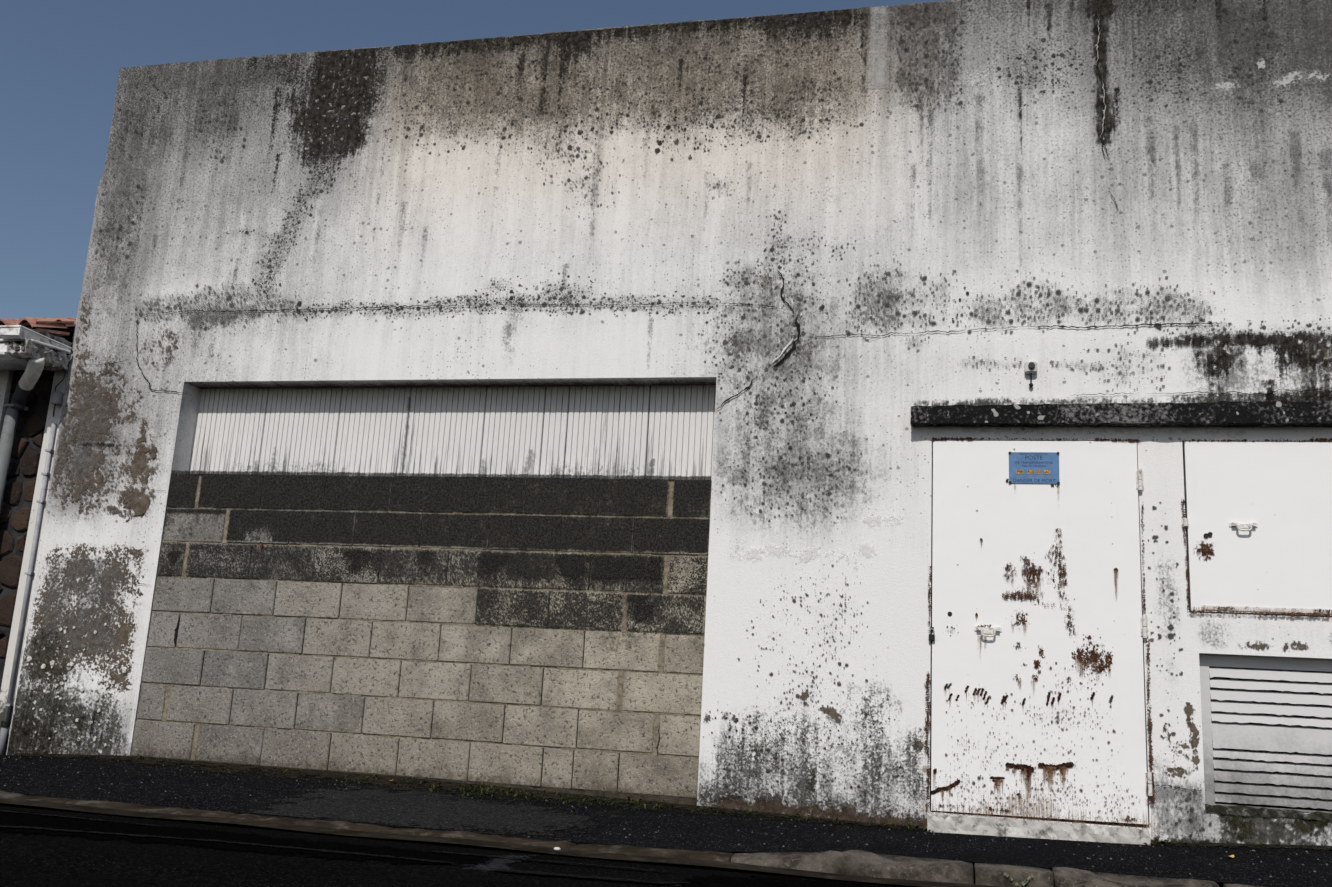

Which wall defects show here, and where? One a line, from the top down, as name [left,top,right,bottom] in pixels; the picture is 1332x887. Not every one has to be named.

crack [81,270,1229,410]
water stain [91,0,1332,634]
water stain [1148,502,1183,676]
rust [1195,541,1215,561]
water stain [7,628,185,760]
water stain [598,687,929,831]
rust [924,528,1155,829]
water stain [1150,769,1332,849]